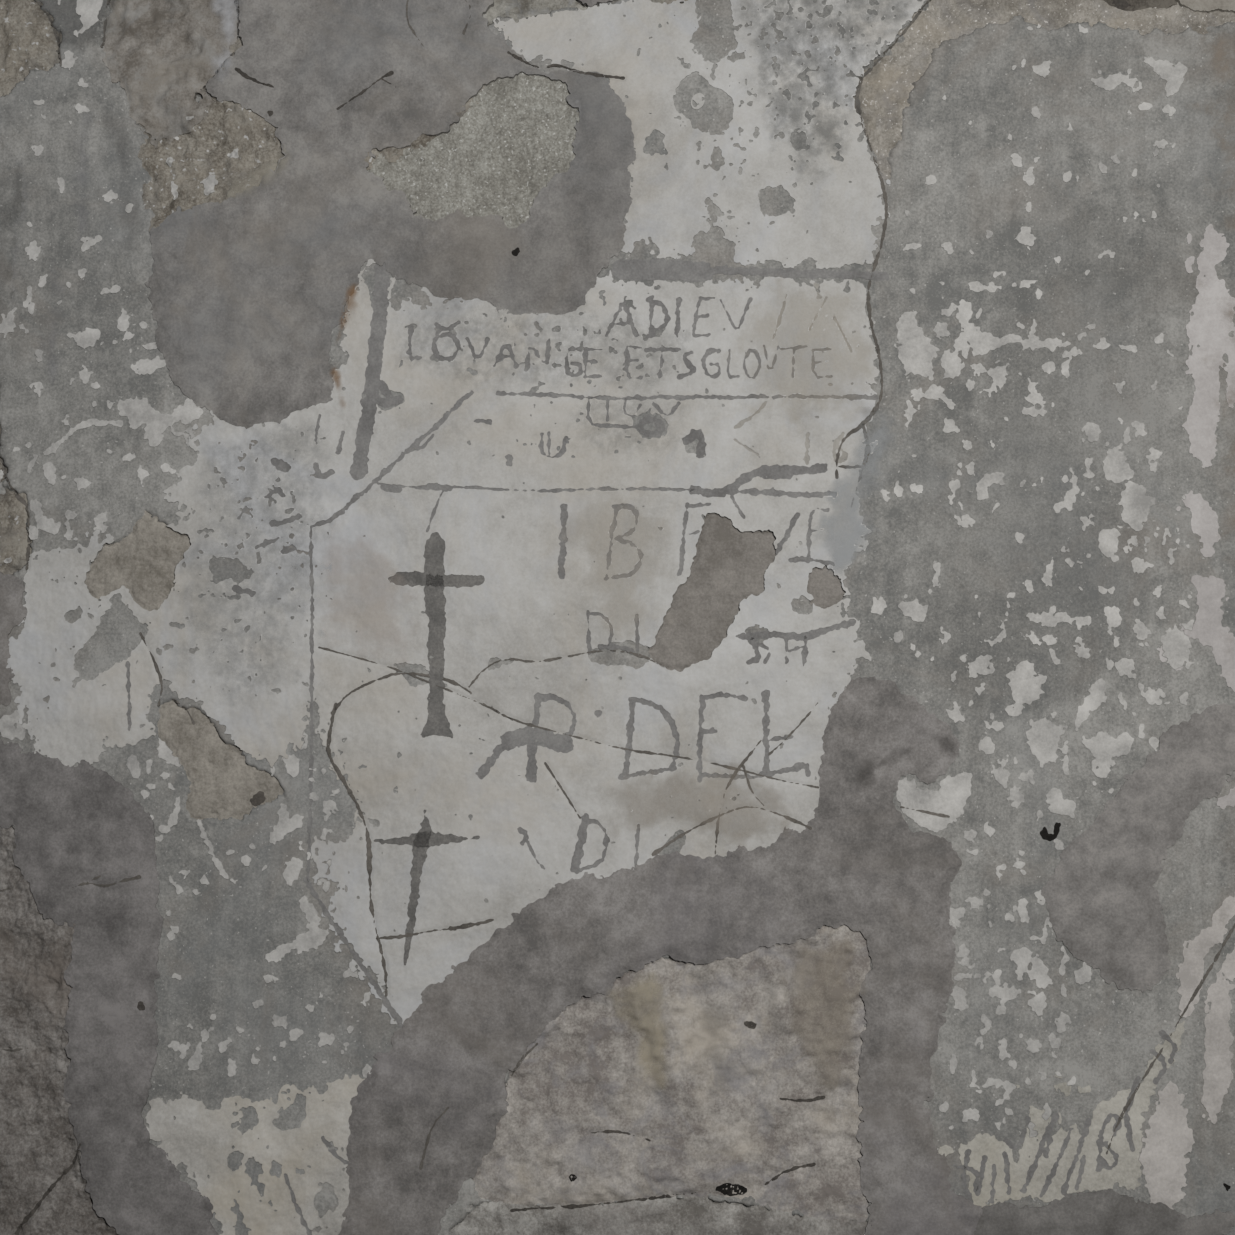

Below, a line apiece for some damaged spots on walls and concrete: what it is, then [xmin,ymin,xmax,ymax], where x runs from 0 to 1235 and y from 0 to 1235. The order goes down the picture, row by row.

spalling [364,72,580,229]
peeling [483,0,1235,269]
peeling [894,271,1137,528]
peeling [1154,224,1235,468]
peeling [0,259,880,1024]
peeling [871,562,941,622]
peeling [946,418,1235,809]
peeling [896,771,995,856]
peeling [1036,788,1076,821]
spalling [0,826,119,1235]
peeling [168,1014,245,1077]
spalling [450,924,871,1235]